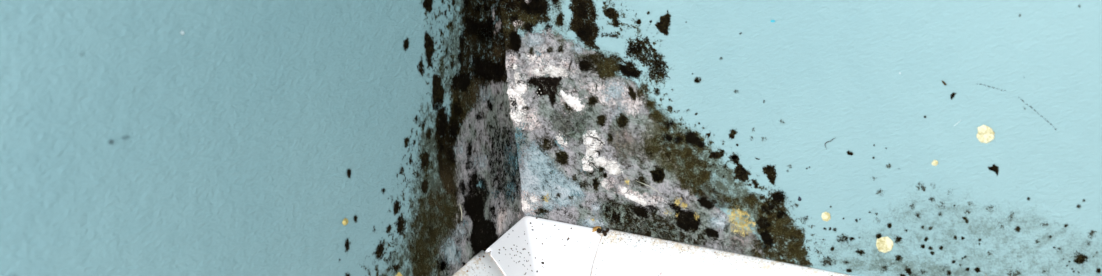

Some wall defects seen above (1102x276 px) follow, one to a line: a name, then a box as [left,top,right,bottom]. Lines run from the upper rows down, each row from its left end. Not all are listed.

water stain [361,0,925,276]
mould [976,125,995,143]
mould [339,215,358,261]
water stain [1036,223,1101,273]